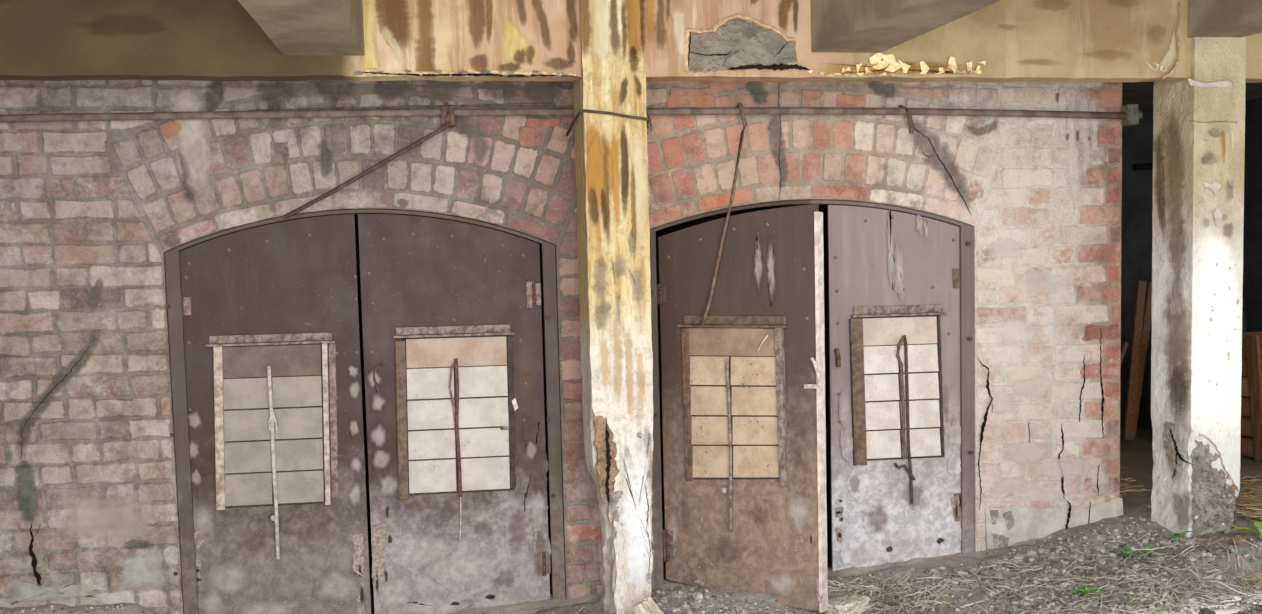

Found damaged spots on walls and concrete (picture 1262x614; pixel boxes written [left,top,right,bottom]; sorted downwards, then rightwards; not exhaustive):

water stain [486,0,577,101]
flaking render [683,13,986,77]
crack [907,117,972,215]
crack [969,122,996,135]
water stain [1155,123,1188,417]
crack [29,519,42,587]
crack [21,347,89,455]
peeling [592,415,664,614]
crack [978,358,994,507]
crack [1058,330,1105,529]
spalling [1163,421,1239,552]